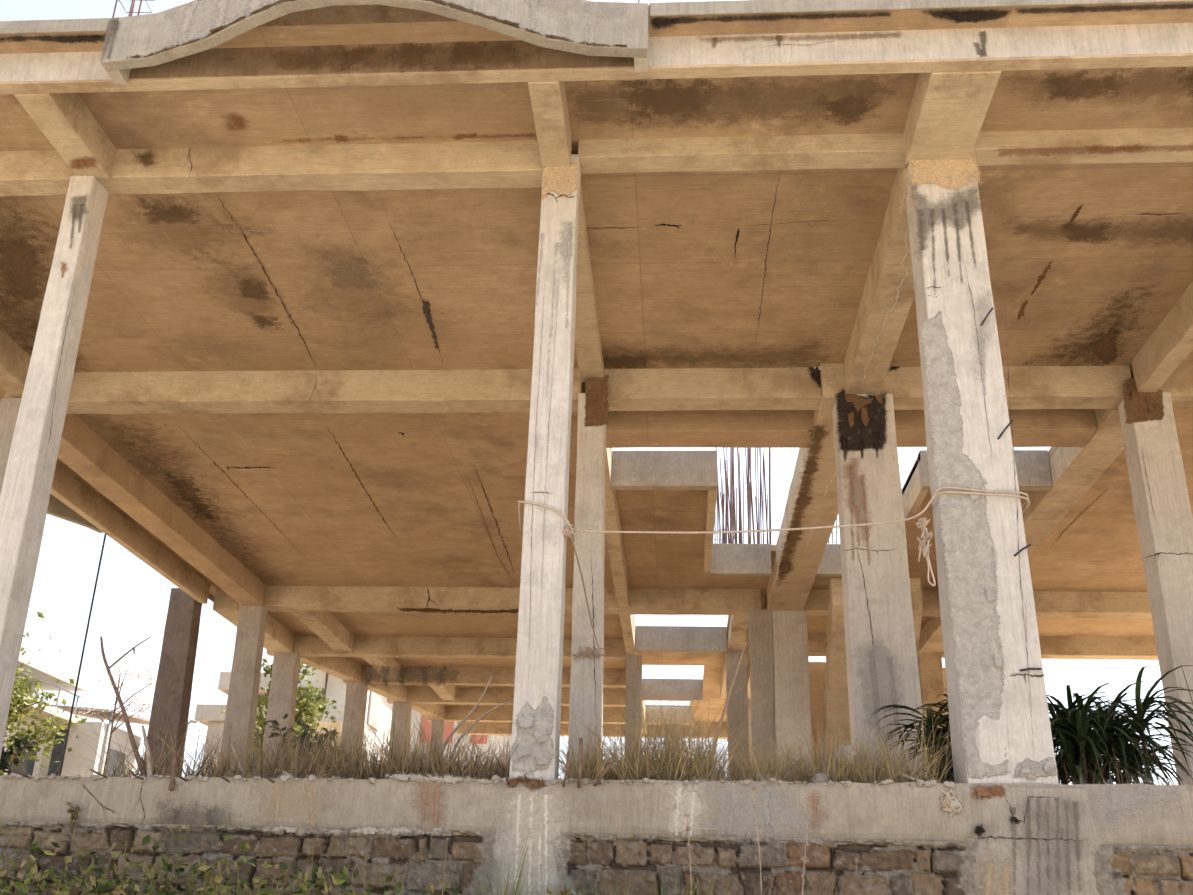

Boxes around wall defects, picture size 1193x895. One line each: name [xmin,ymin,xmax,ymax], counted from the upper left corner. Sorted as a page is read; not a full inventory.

water stain [0,196,86,351]
crack [105,197,393,533]
crack [352,225,518,304]
crack [734,179,837,340]
water stain [809,367,821,387]
spalling [844,393,883,428]
water stain [909,150,980,282]
water stain [1040,292,1150,366]
water stain [777,389,887,581]
spalling [921,312,1057,800]
crack [1142,451,1191,561]
spalling [386,697,554,791]